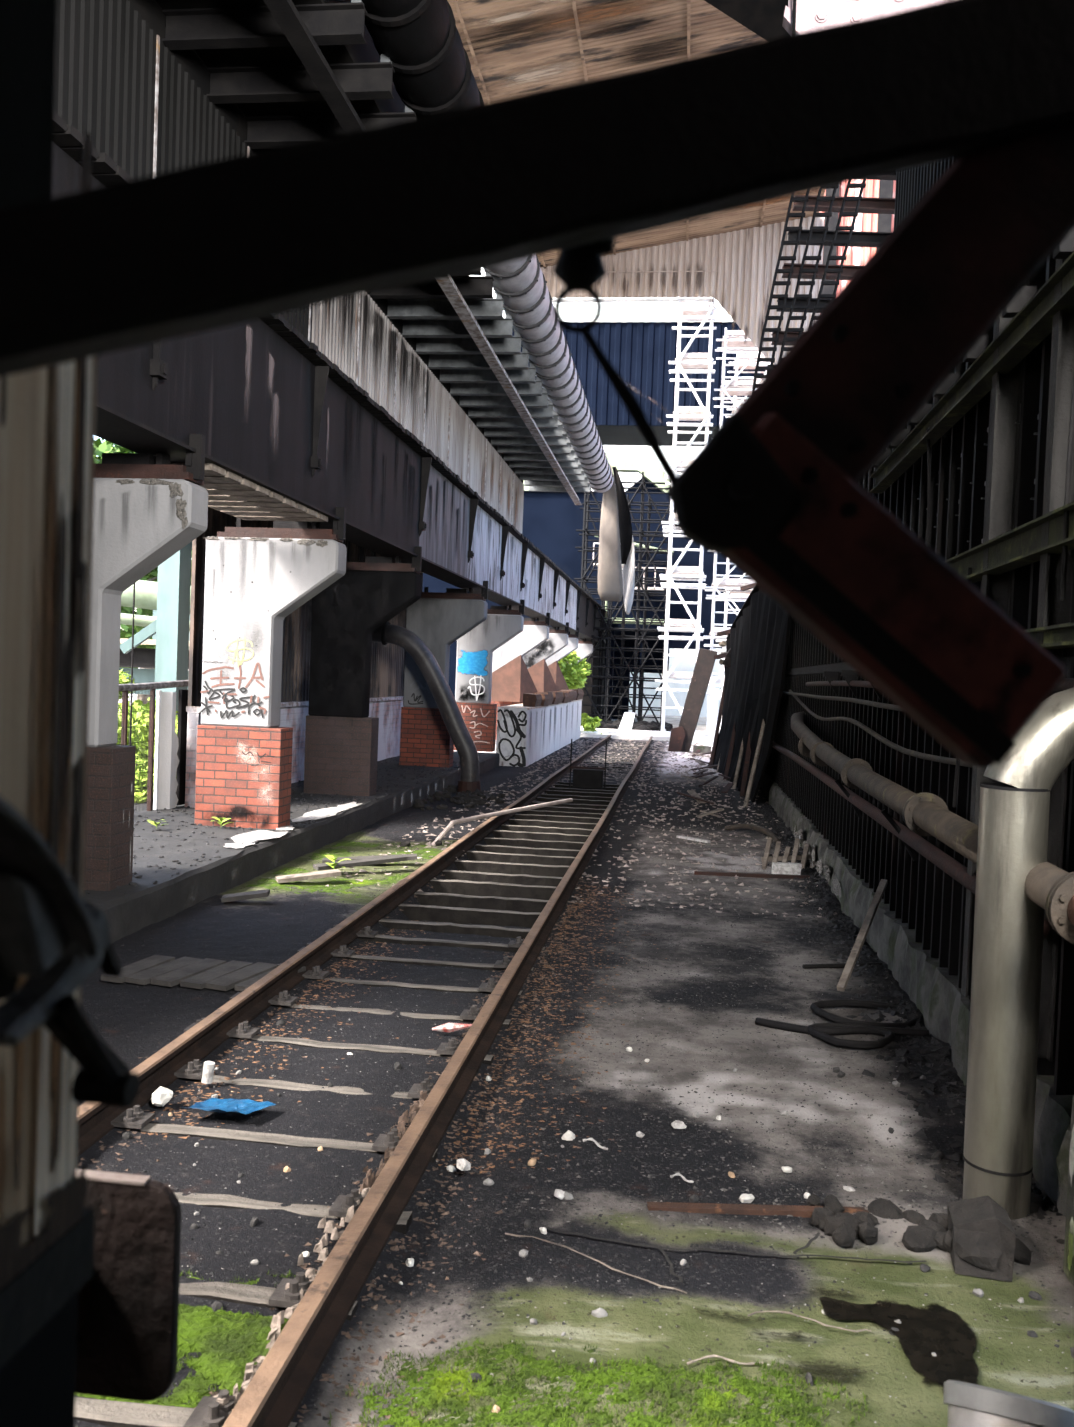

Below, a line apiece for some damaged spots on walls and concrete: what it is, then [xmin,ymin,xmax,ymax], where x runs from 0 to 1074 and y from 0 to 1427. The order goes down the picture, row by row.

water stain [269,353,278,444]
water stain [325,295,430,411]
water stain [326,397,465,547]